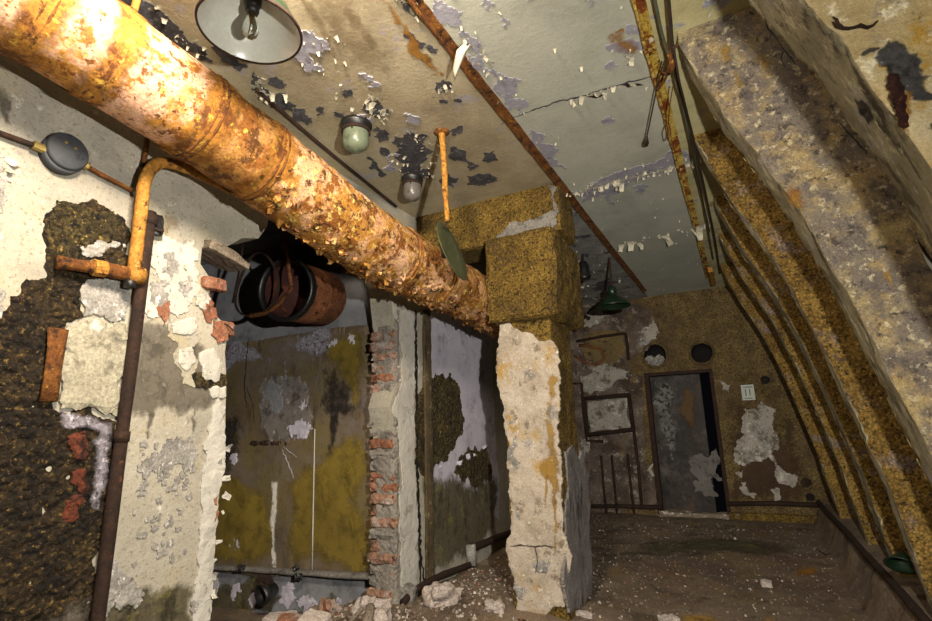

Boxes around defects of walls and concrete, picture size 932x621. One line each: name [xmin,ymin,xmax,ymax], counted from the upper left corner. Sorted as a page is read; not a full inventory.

peeling [118,0,498,189]
corrosion [390,6,444,76]
peeling [432,0,529,115]
crack [501,74,659,125]
corrosion [609,28,636,53]
corrosion [887,73,912,130]
peeling [496,150,701,238]
peeling [580,251,629,394]
spalling [0,198,131,621]
corrosion [540,375,558,551]
peeling [734,401,798,501]
spalling [106,559,145,617]